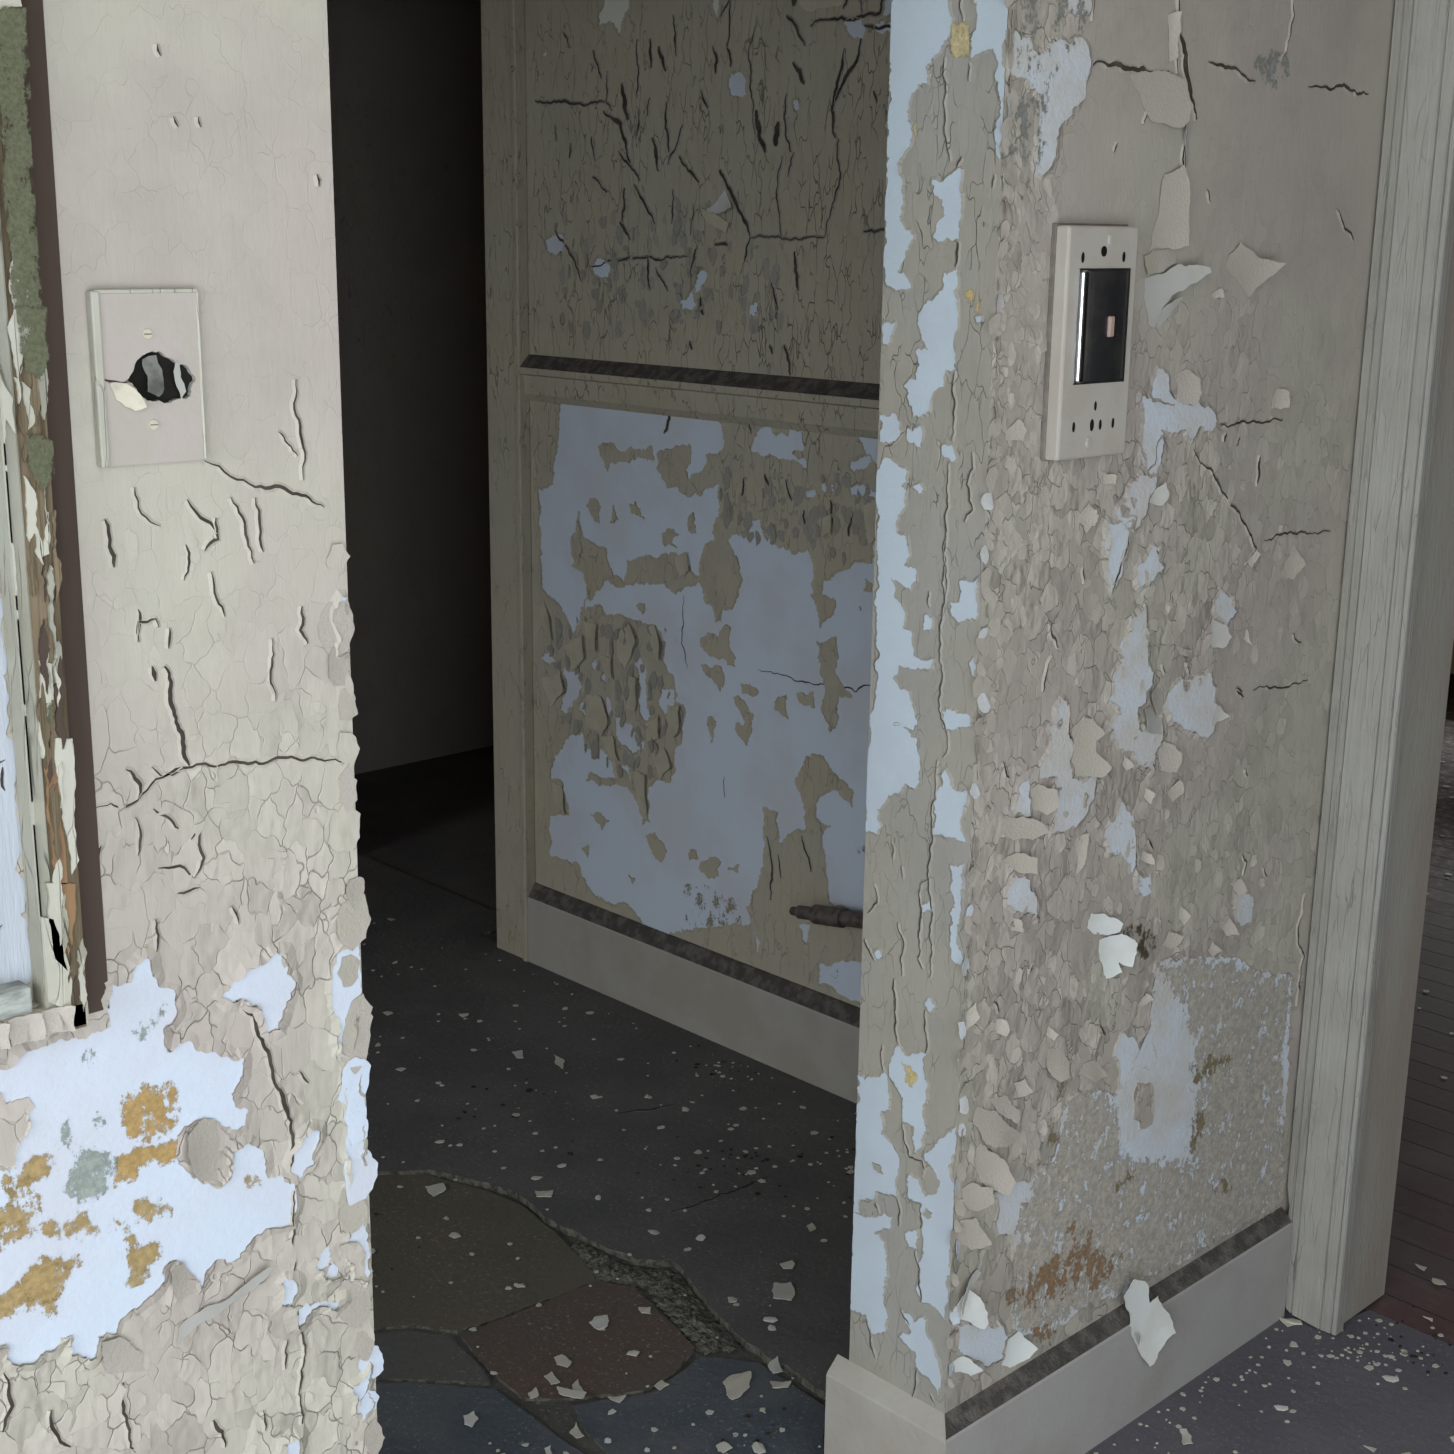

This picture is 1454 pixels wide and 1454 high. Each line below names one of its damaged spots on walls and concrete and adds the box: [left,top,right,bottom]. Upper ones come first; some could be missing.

crack [535,0,891,350]
crack [1091,0,1295,204]
crack [101,379,325,618]
peeling [1285,545,1306,579]
crack [96,606,345,952]
peeling [537,0,1293,1397]
peeling [0,524,385,1454]
crack [234,999,310,1271]
crack [0,1372,72,1450]
crack [118,1381,136,1454]
crack [210,1418,228,1448]
crack [260,1310,307,1432]